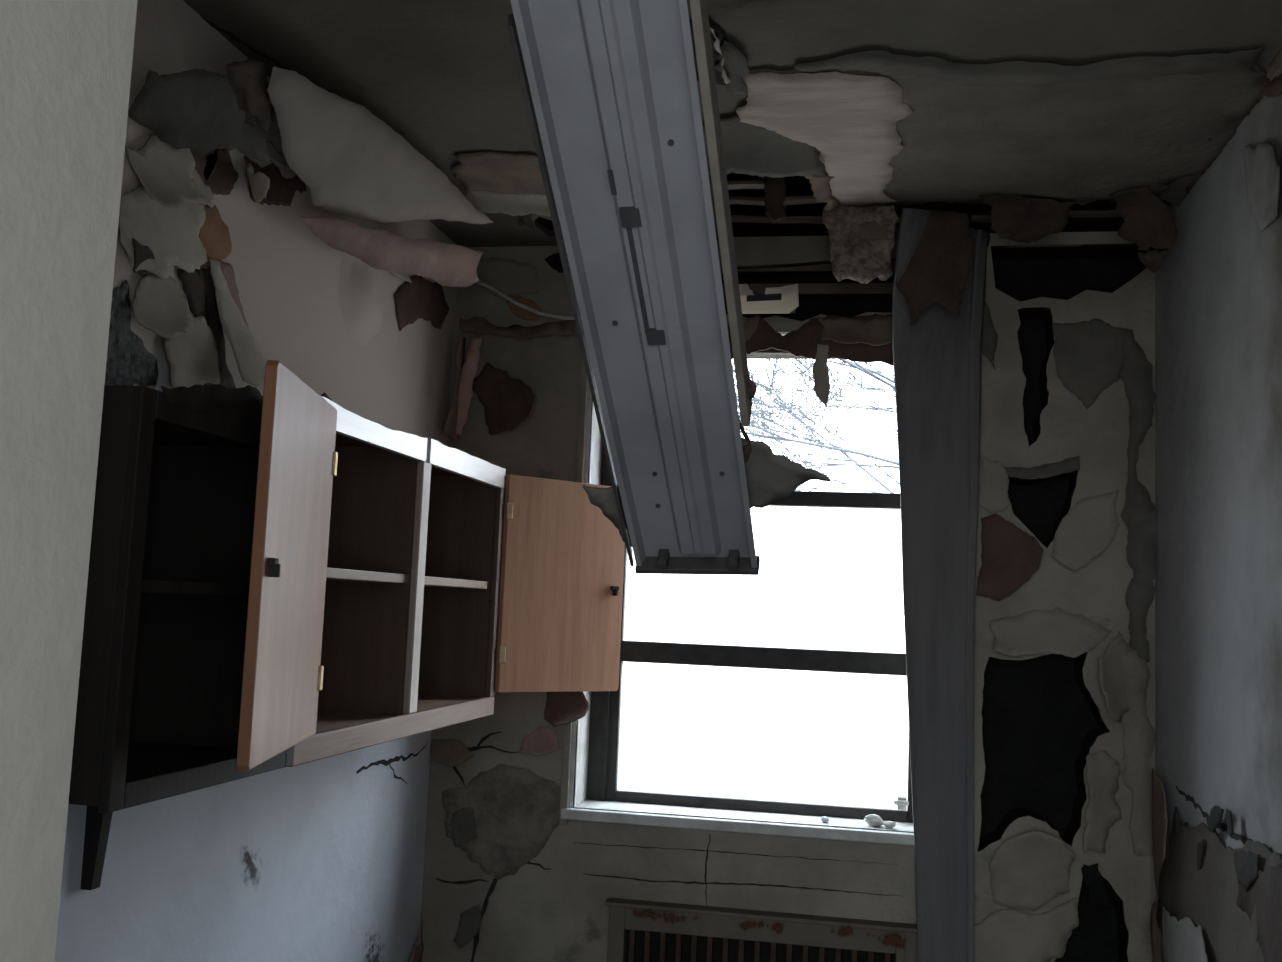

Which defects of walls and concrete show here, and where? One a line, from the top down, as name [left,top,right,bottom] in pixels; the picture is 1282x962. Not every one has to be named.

peeling [105,59,576,435]
flaking render [703,40,1282,962]
crack [436,878,497,962]
crack [527,862,551,870]